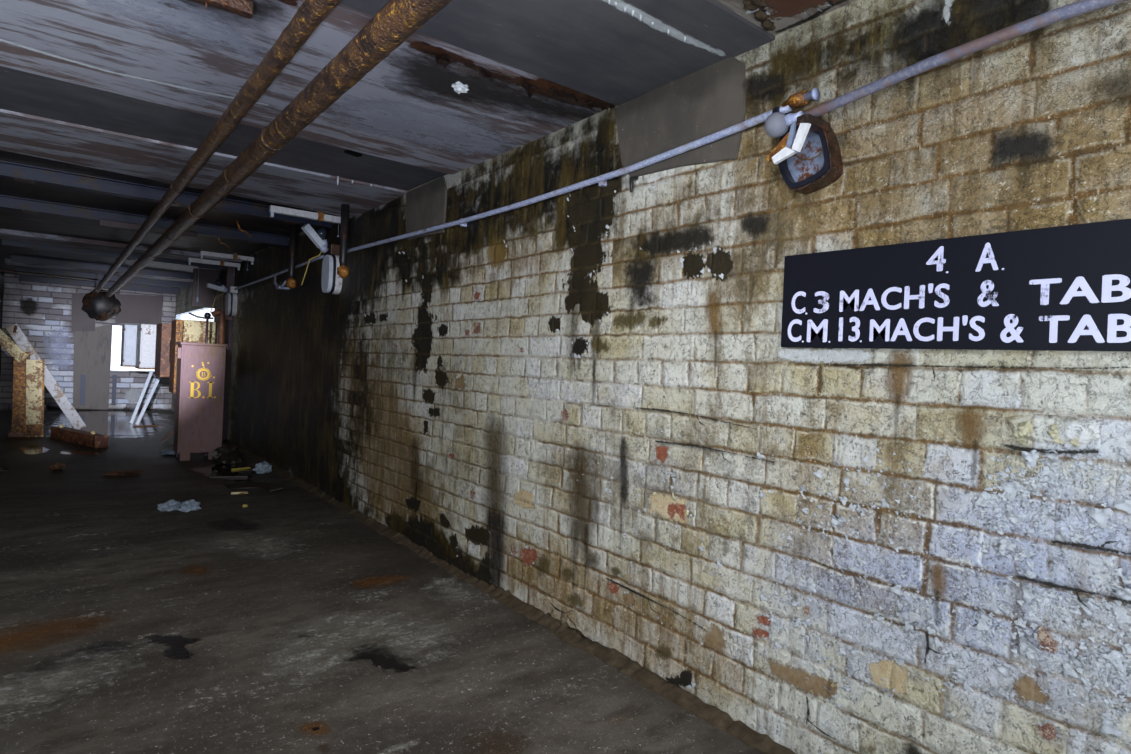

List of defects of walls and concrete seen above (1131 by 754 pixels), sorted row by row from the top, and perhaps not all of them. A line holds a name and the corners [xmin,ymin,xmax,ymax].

peeling [742,0,837,31]
water stain [392,251,411,284]
water stain [613,225,712,329]
water stain [406,424,504,600]
water stain [284,616,434,674]
spalling [751,446,1131,754]